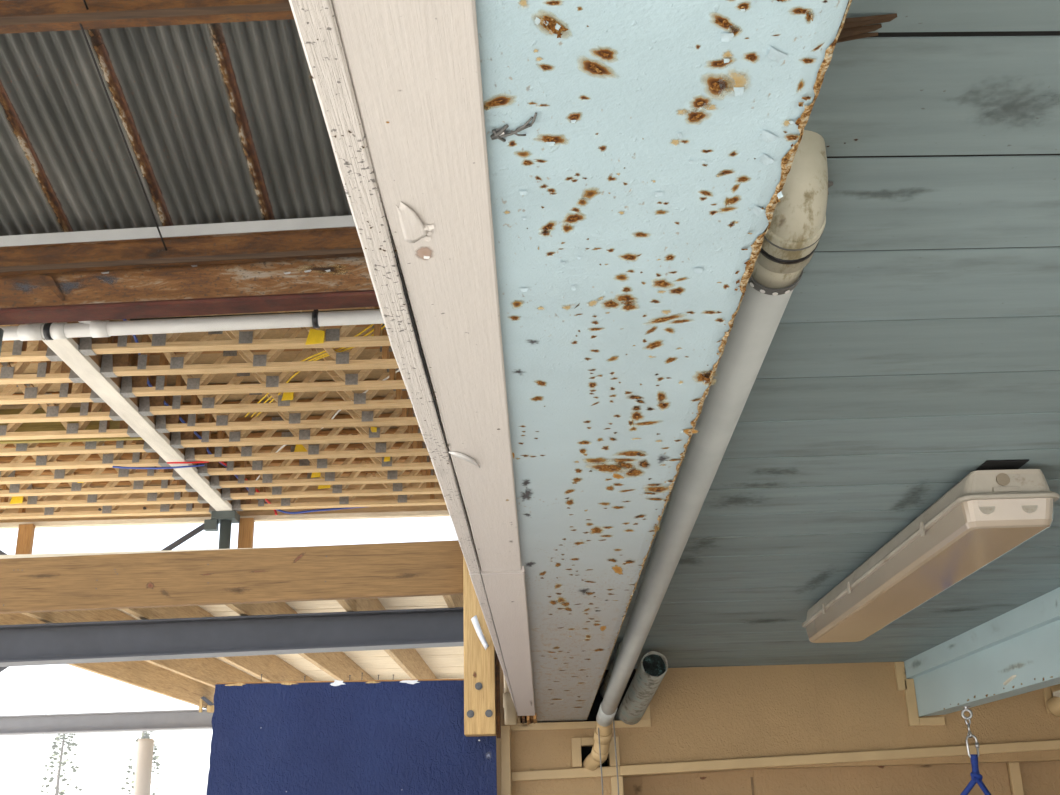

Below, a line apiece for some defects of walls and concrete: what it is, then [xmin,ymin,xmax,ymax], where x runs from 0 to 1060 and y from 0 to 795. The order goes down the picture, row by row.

corrosion [0,80,74,232]
corrosion [87,29,174,226]
corrosion [211,24,275,220]
corrosion [484,96,512,110]
corrosion [509,141,555,195]
corrosion [534,0,852,718]